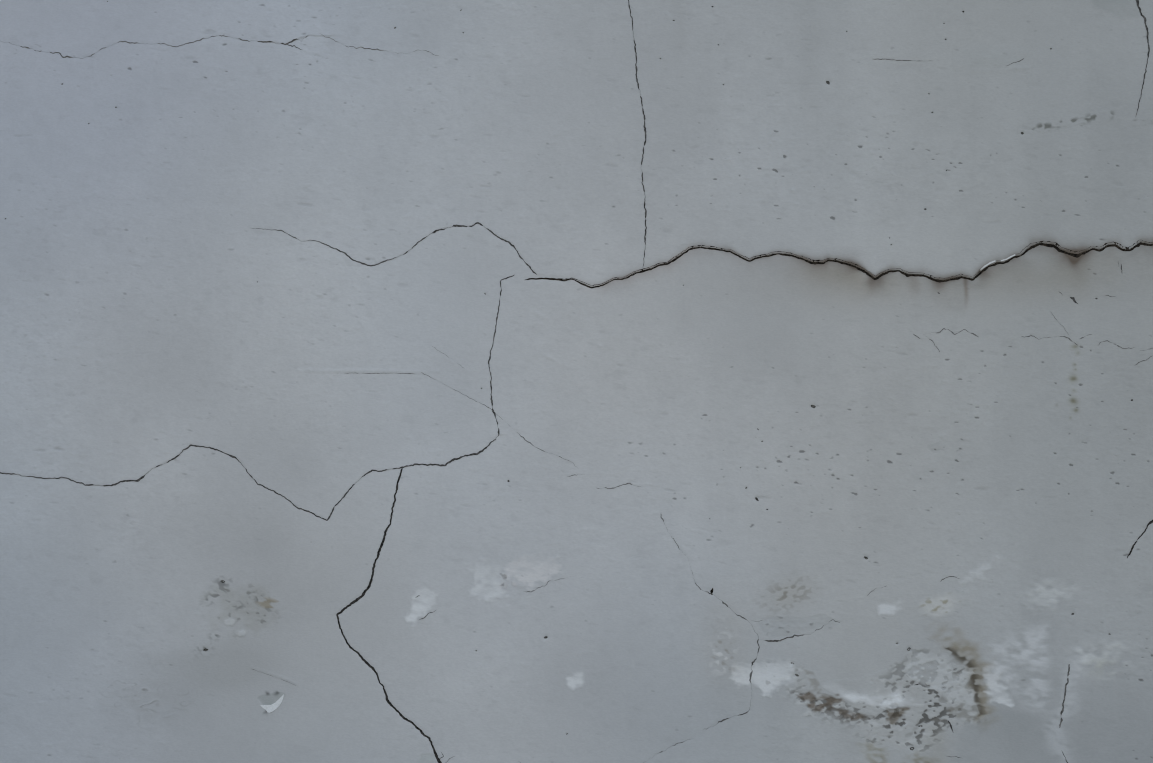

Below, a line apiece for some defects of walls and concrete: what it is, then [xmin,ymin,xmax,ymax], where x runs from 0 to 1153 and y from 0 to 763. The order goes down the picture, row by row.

crack [16,35,439,59]
crack [252,0,1153,288]
damp [658,256,1153,345]
spalling [196,572,292,645]
crack [0,275,514,763]
flaking render [402,586,440,628]
flaking render [500,548,573,595]
crack [1127,520,1153,558]
peeling [256,689,288,716]
crack [657,573,840,754]
spalling [728,618,1153,763]
crack [1059,664,1070,763]